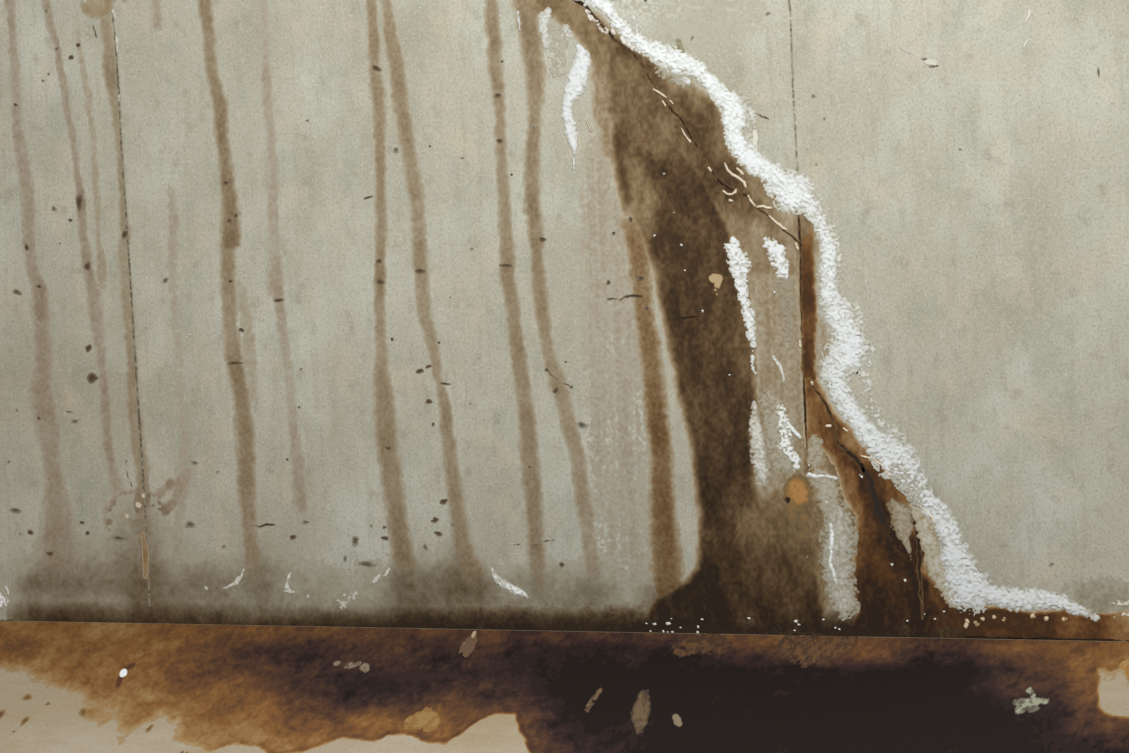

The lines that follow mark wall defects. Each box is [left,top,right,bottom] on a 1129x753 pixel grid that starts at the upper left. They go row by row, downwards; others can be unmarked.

rust [80,0,127,19]
water stain [41,0,123,495]
water stain [100,14,151,493]
water stain [259,0,309,519]
crack [573,0,1129,641]
water stain [807,434,832,476]
water stain [806,472,838,480]
water stain [450,601,663,633]
water stain [699,616,769,635]
water stain [816,500,861,621]
water stain [812,607,885,637]
water stain [886,476,954,604]